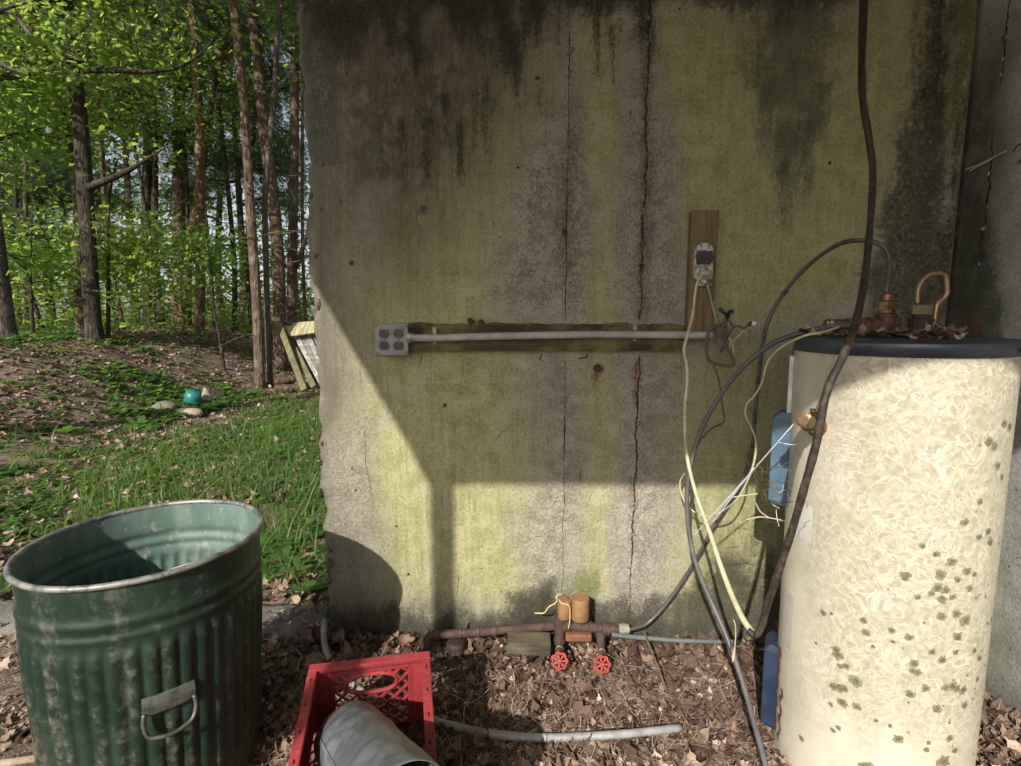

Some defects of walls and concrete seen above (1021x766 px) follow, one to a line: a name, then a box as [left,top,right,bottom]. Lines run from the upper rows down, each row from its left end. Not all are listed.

leakage [300,0,653,177]
crack [560,3,615,321]
crack [636,0,660,322]
leakage [329,560,781,646]
crack [625,355,642,616]